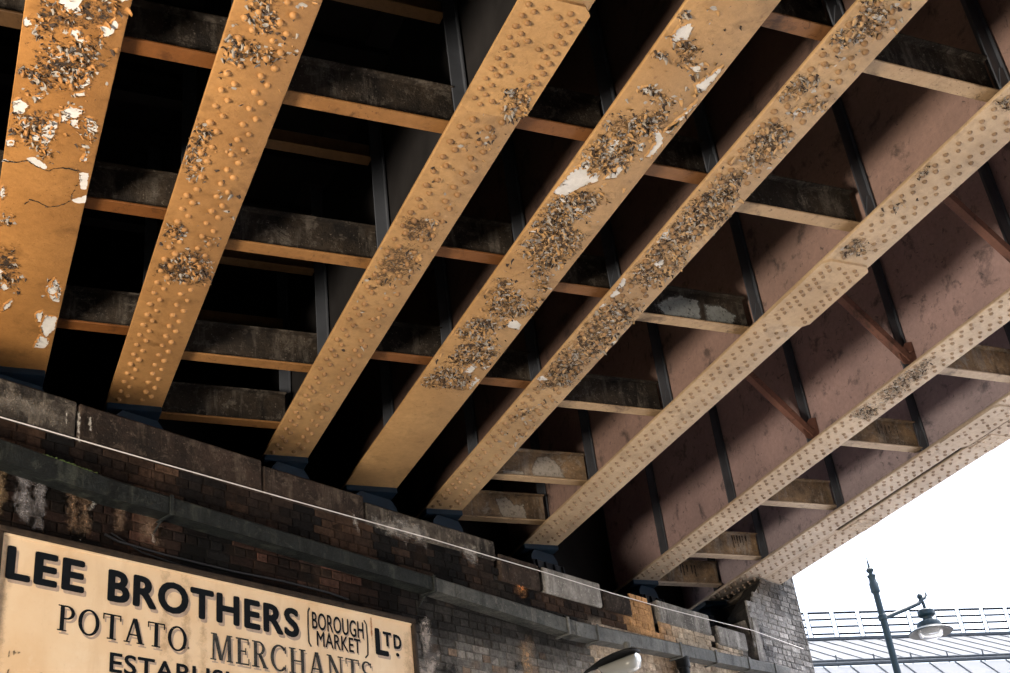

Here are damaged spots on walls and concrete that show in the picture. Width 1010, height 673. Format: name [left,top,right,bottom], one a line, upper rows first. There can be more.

peeling [6,0,133,164]
peeling [218,0,321,90]
peeling [0,247,27,312]
crack [2,157,89,208]
peeling [32,277,64,349]
peeling [156,223,222,287]
peeling [181,123,241,220]
peeling [348,166,458,320]
peeling [419,10,725,397]
peeling [490,0,912,447]
peeling [850,352,944,420]
leakage [15,478,45,525]